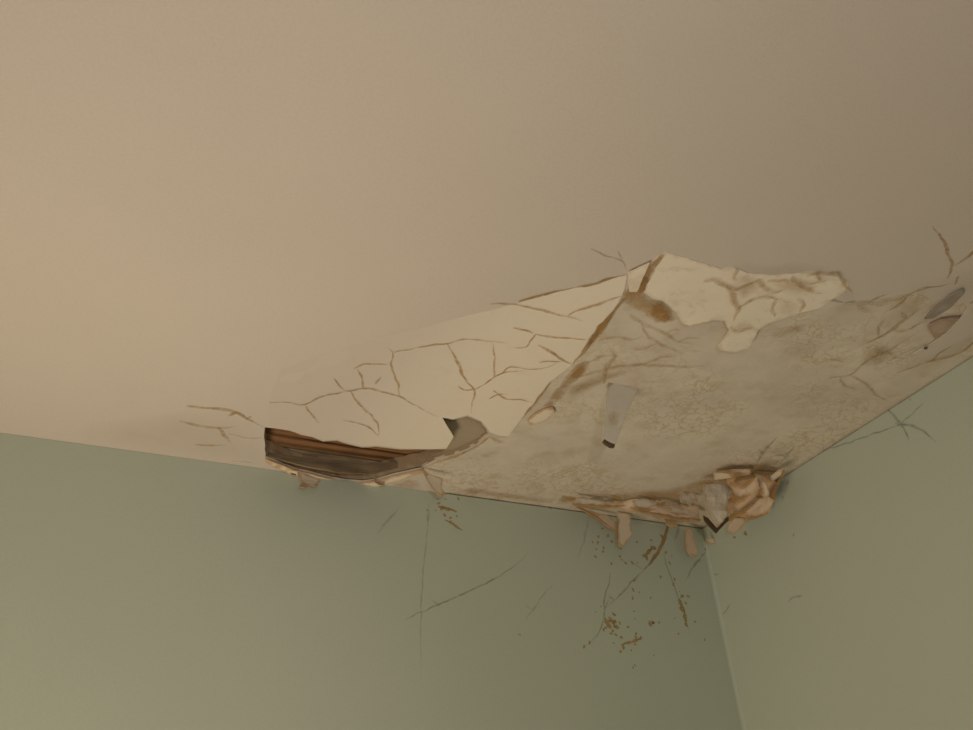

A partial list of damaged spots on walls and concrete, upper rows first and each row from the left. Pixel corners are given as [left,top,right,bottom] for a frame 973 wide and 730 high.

crack [927,234,973,288]
crack [420,257,662,415]
crack [207,408,258,439]
crack [285,354,403,431]
spalling [264,252,973,557]
crack [644,526,668,569]